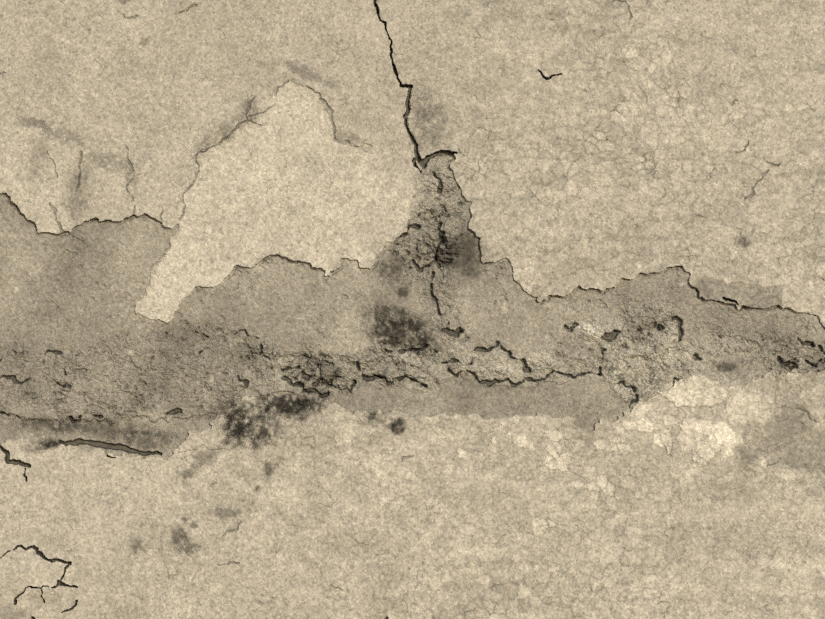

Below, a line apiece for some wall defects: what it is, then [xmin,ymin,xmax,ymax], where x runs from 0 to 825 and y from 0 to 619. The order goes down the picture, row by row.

crack [373,0,457,173]
peeling [0,79,825,480]
crack [0,443,31,482]
crack [58,438,163,458]
crack [0,544,78,619]